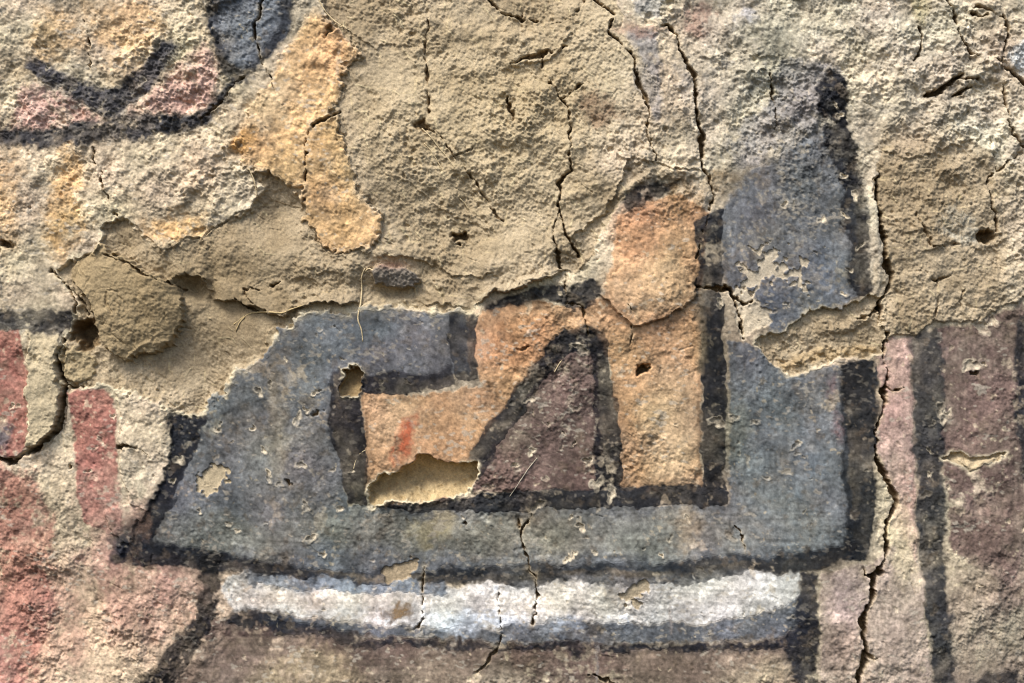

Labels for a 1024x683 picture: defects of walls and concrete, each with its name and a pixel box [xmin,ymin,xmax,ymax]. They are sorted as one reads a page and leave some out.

crack [0,339,90,466]
spalling [196,463,231,515]
spalling [9,0,711,447]
spalling [381,556,419,585]
spalling [364,454,479,512]
crack [423,18,504,222]
crack [487,0,658,335]
crack [661,24,715,260]
spalling [717,243,885,379]
crack [855,171,904,683]
flaking render [926,447,1005,472]
crack [923,0,1024,232]